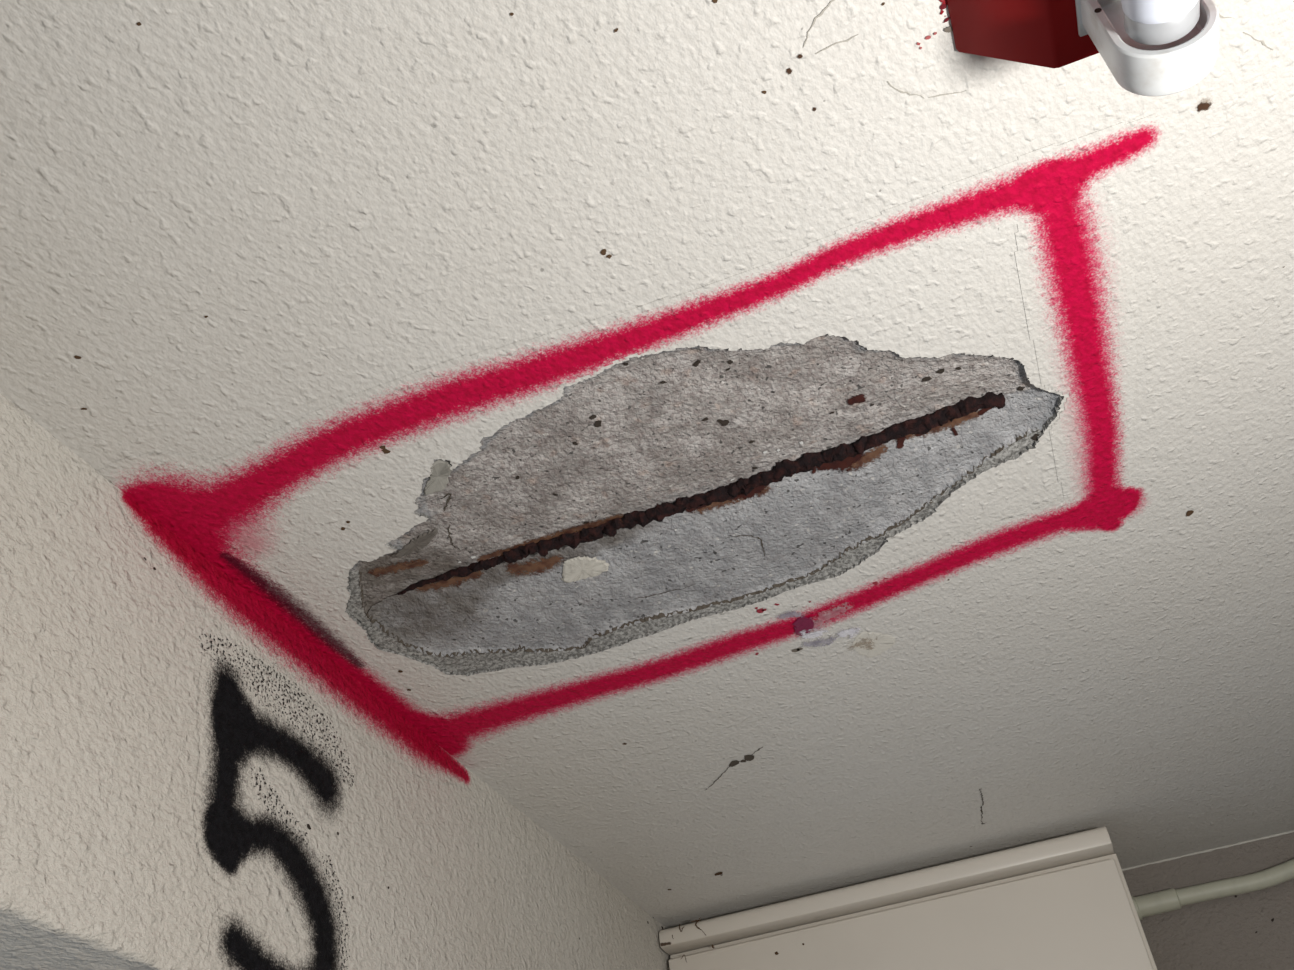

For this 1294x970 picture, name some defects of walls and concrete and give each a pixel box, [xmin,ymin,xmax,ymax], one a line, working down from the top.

corrosion [847,394,866,406]
corrosion [812,406,994,474]
spalling [345,334,1064,676]
corrosion [685,484,771,514]
corrosion [368,559,429,578]
corrosion [416,514,623,593]